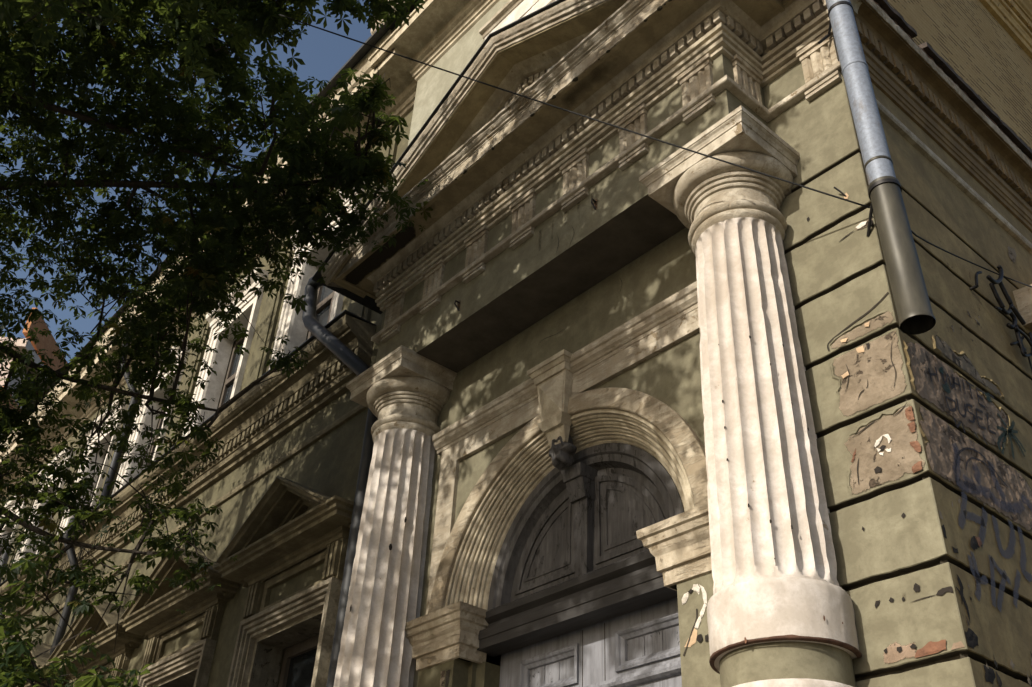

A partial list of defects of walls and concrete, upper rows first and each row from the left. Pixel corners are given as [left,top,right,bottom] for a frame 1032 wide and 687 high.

flaking render [827,292,1032,553]
flaking render [883,640,965,664]